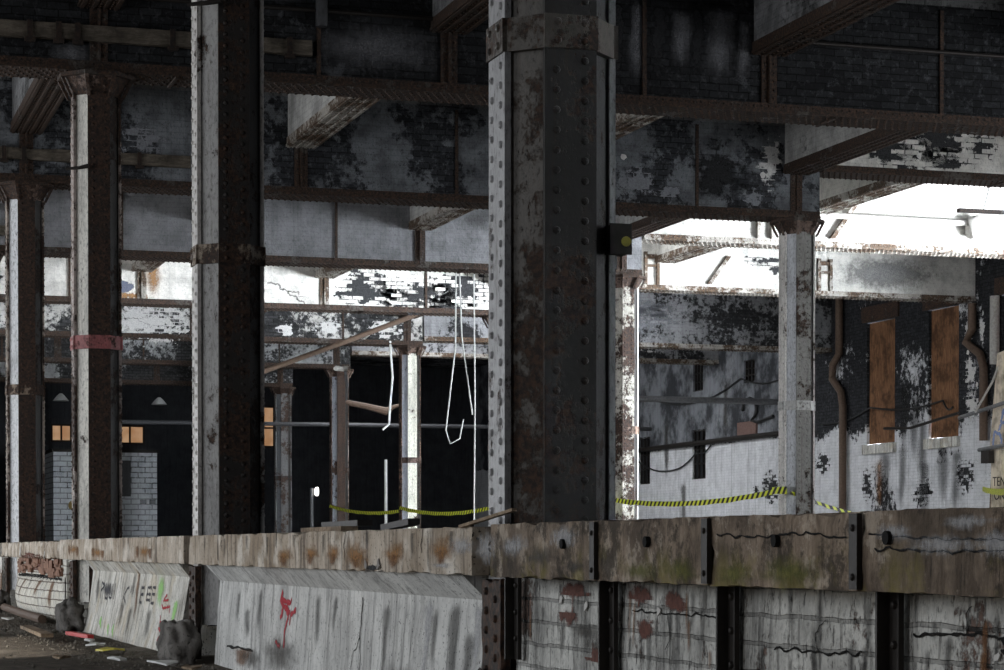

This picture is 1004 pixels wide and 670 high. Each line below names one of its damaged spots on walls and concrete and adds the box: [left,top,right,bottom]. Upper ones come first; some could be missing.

damp [616,4,749,80]
peeling [869,132,998,171]
peeling [333,269,489,339]
peeling [275,324,293,336]
peeling [312,316,345,334]
peeling [815,452,830,475]
peeling [956,460,974,496]
corrosion [329,548,363,567]
corrosion [387,545,402,566]
crack [716,531,1004,555]
crack [774,620,862,657]
crack [913,606,1004,655]